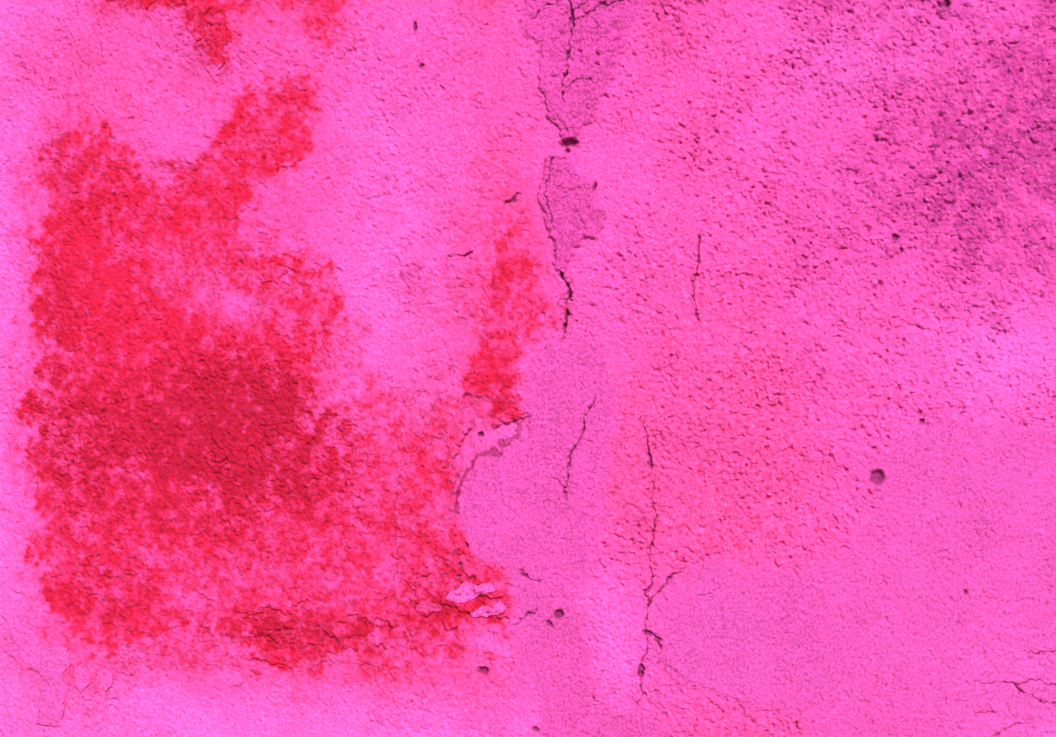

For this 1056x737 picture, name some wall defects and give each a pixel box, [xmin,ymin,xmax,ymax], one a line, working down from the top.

crack [531,0,627,104]
water stain [0,0,577,709]
crack [556,268,574,341]
crack [540,395,597,505]
crack [635,414,689,707]